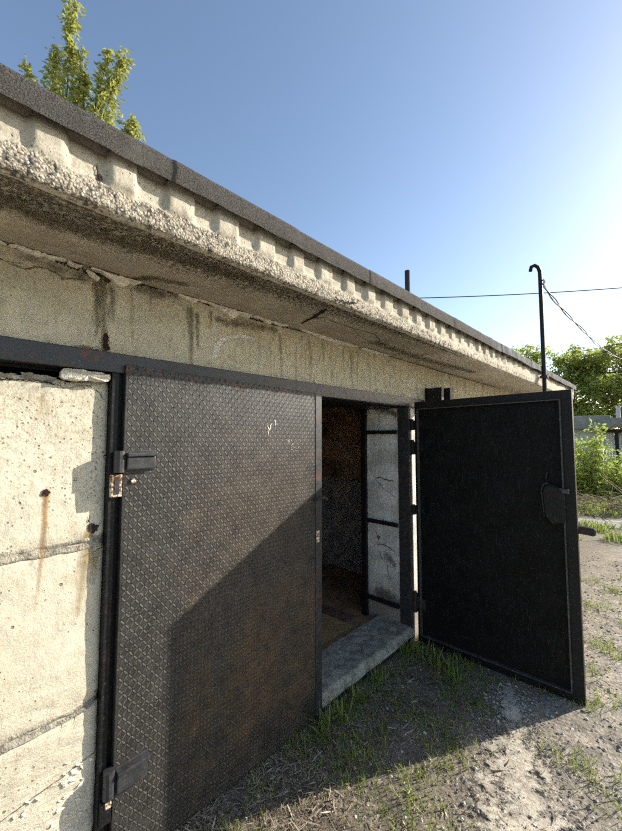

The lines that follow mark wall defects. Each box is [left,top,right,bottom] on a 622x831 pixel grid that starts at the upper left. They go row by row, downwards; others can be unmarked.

crack [0,244,111,283]
damp [0,150,472,358]
spalling [0,139,539,384]
crack [239,297,494,387]
rust [42,489,50,549]